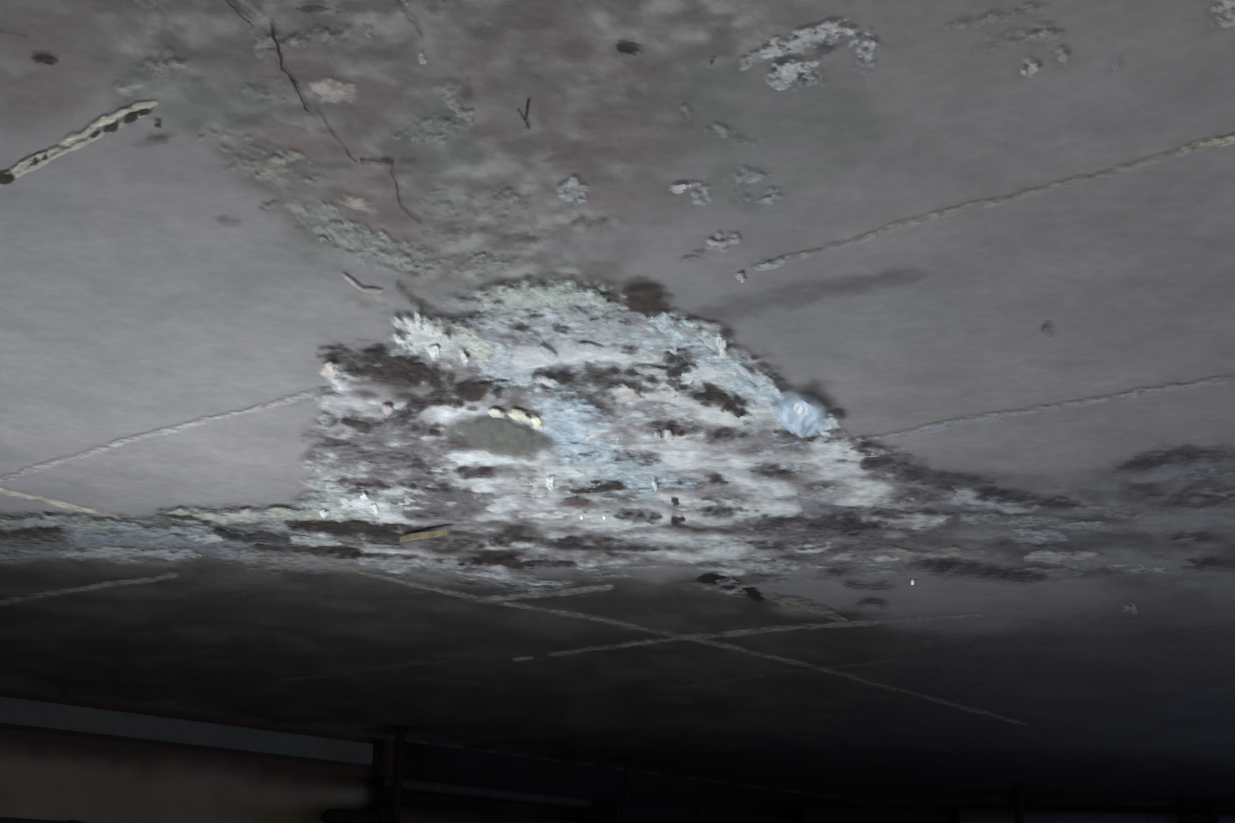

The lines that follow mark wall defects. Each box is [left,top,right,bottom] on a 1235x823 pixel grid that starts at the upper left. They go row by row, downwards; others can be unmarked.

peeling [144,50,188,78]
peeling [198,131,311,181]
peeling [240,37,286,120]
crack [226,0,422,225]
peeling [301,196,463,277]
water stain [0,0,876,317]
spalling [290,281,957,625]
water stain [830,430,1235,586]